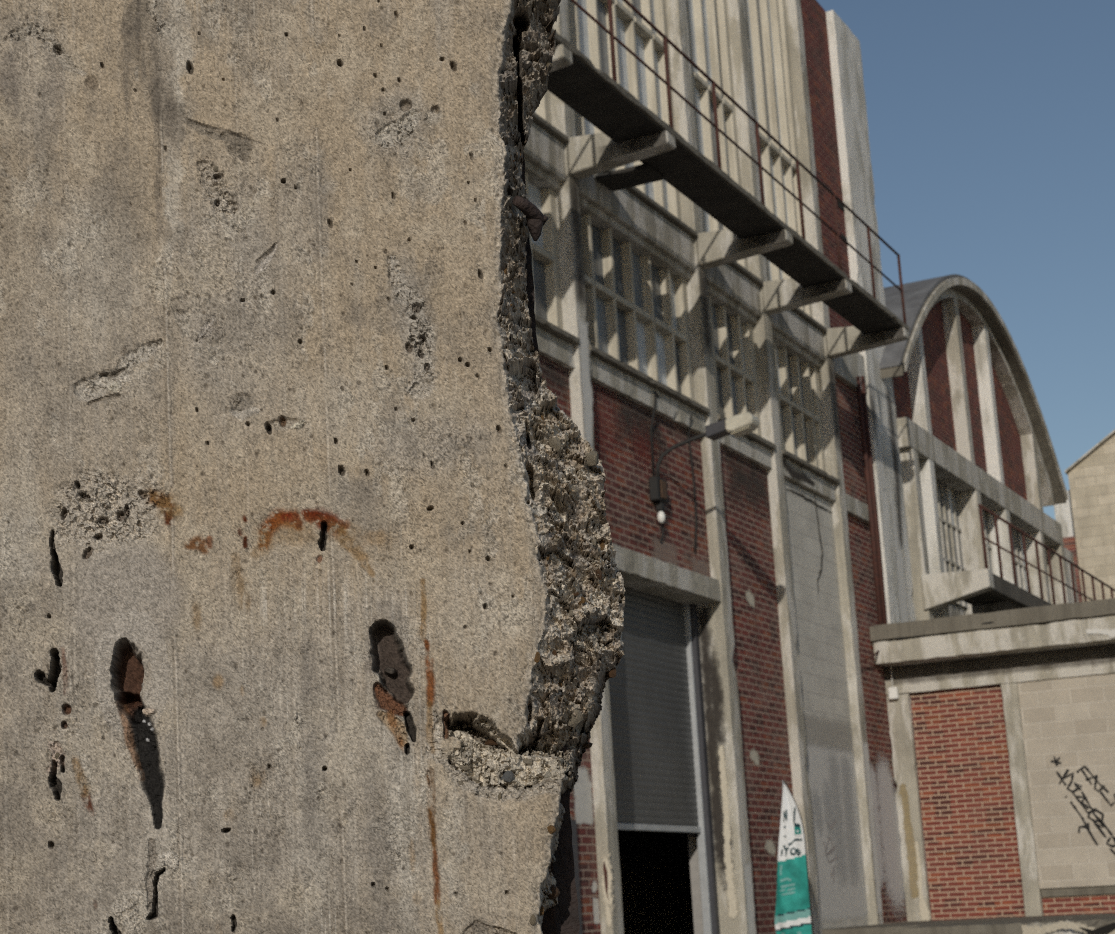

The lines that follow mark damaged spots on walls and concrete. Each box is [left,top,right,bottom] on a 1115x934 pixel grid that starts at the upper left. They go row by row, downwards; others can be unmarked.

spalling [373,98,443,150]
spalling [405,336,430,371]
spalling [424,0,625,934]
corrosion [229,504,396,615]
crack [786,489,833,596]
corrosion [418,577,437,740]
corrosion [373,682,409,754]
peeling [376,710,409,745]
water stain [697,608,731,874]
crack [108,838,180,934]
corrosion [407,766,446,934]
spalling [1021,920,1115,934]